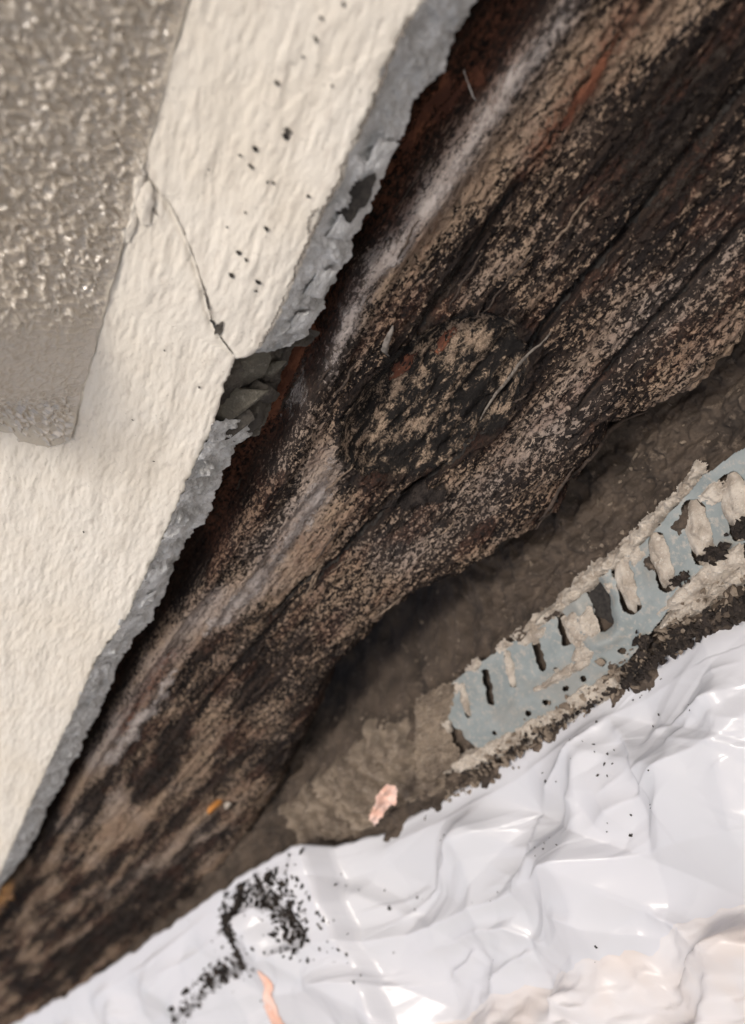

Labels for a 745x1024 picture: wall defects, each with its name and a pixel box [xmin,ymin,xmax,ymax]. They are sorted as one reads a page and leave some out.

crack [146,175,236,360]
spalling [0,0,477,889]
spalling [656,564,745,632]
spalling [443,677,623,774]